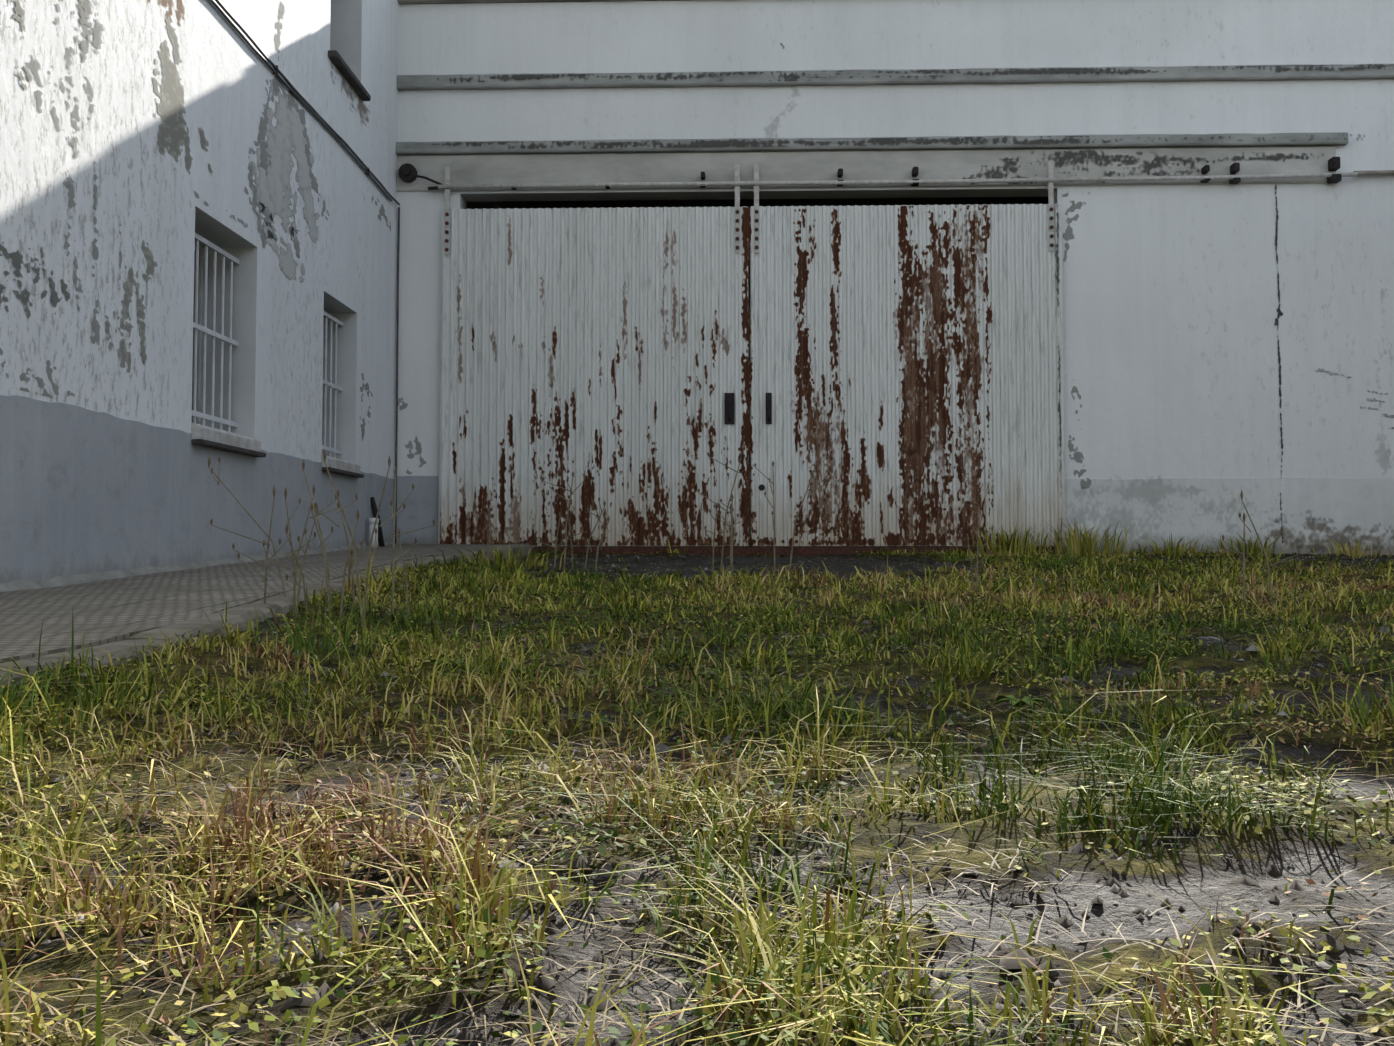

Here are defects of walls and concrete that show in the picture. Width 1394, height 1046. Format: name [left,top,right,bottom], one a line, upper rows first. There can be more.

peeling [0,0,157,373]
peeling [147,0,213,174]
peeling [230,76,328,282]
corrosion [440,205,1009,546]
crack [1274,185,1283,543]
crack [1317,369,1394,429]